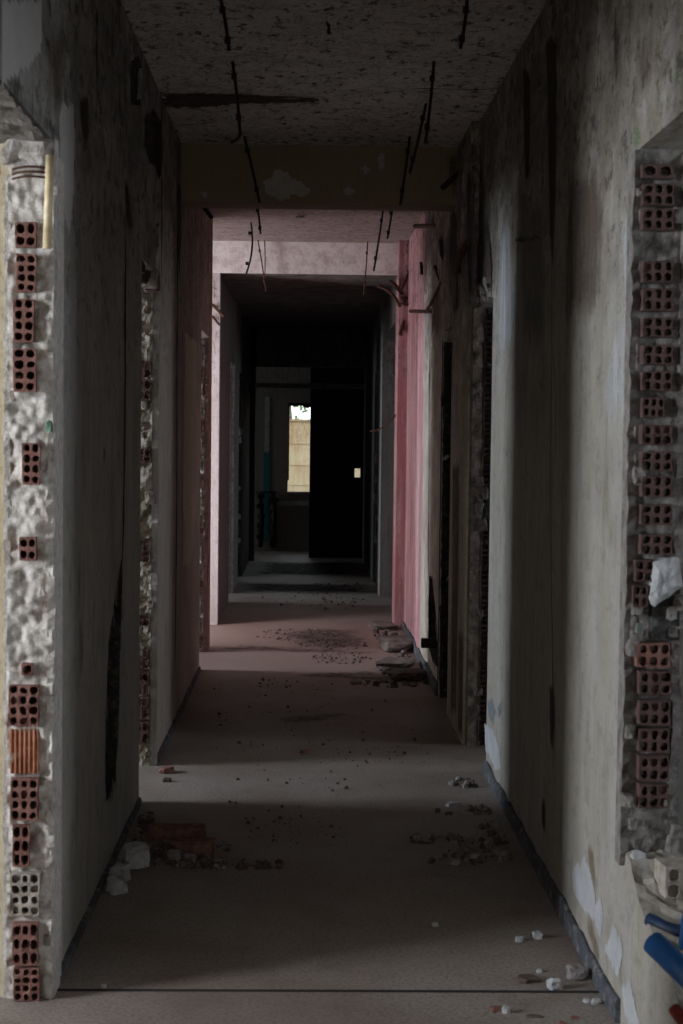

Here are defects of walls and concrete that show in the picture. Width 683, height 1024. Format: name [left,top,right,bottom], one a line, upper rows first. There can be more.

spalling [647,588,681,640]
peeling [572,855,639,1024]